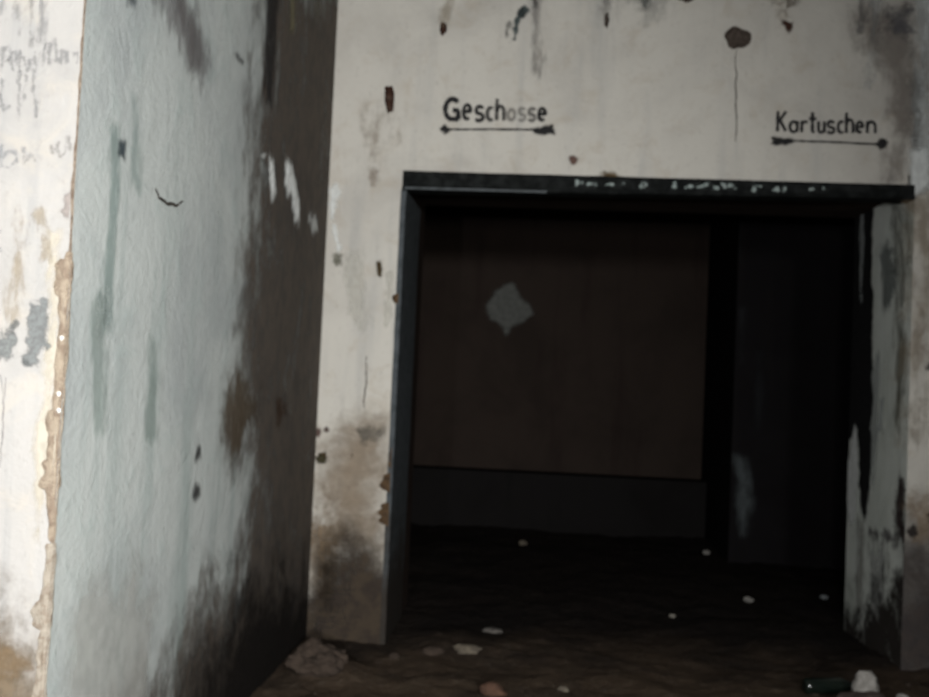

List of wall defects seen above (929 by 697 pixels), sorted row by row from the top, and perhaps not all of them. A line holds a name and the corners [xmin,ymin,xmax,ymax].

spalling [0,252,74,697]